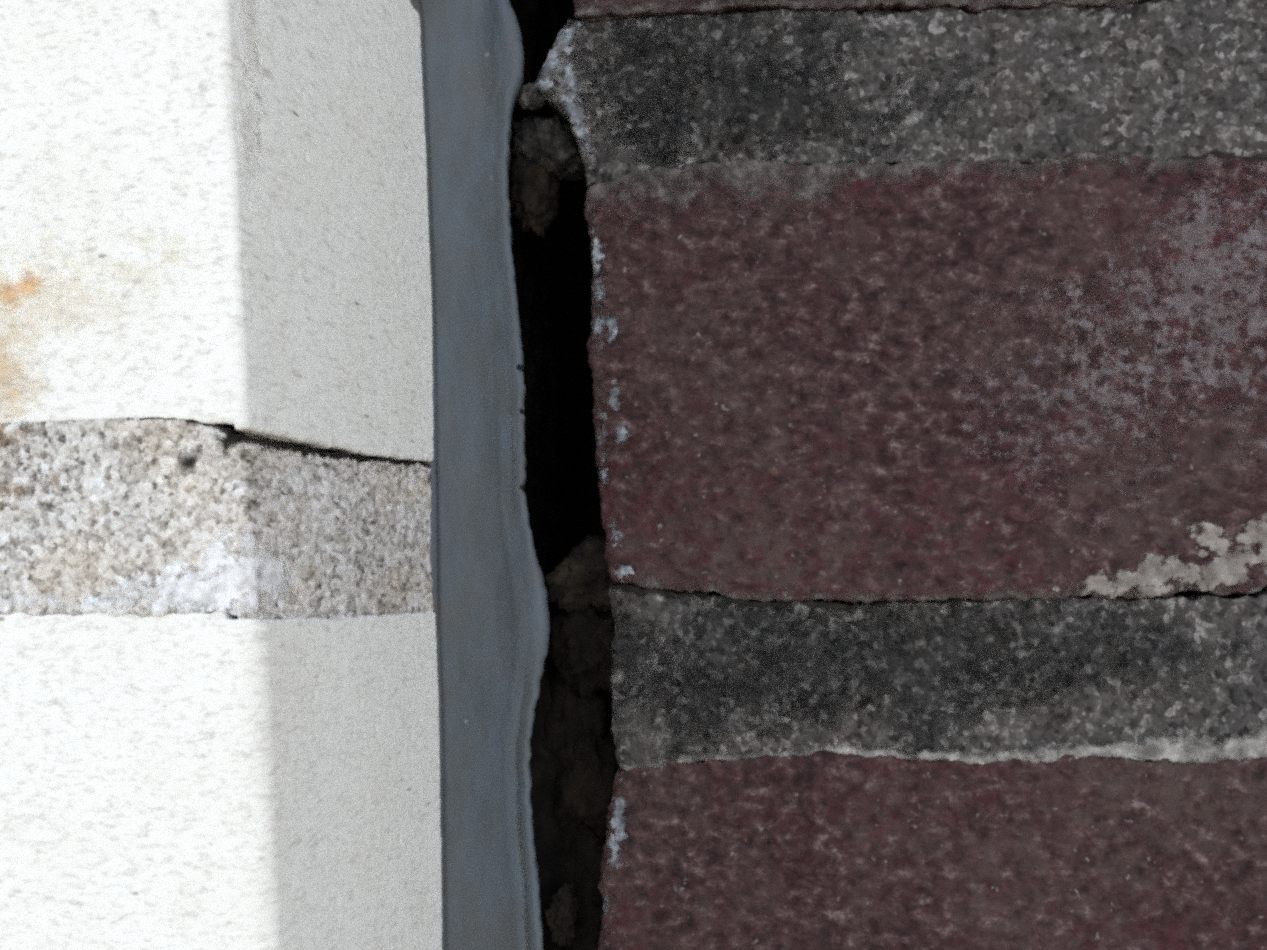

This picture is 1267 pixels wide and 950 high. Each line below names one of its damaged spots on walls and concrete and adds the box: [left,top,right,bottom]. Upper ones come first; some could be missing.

crack [614,0,1159,20]
crack [609,584,1245,611]